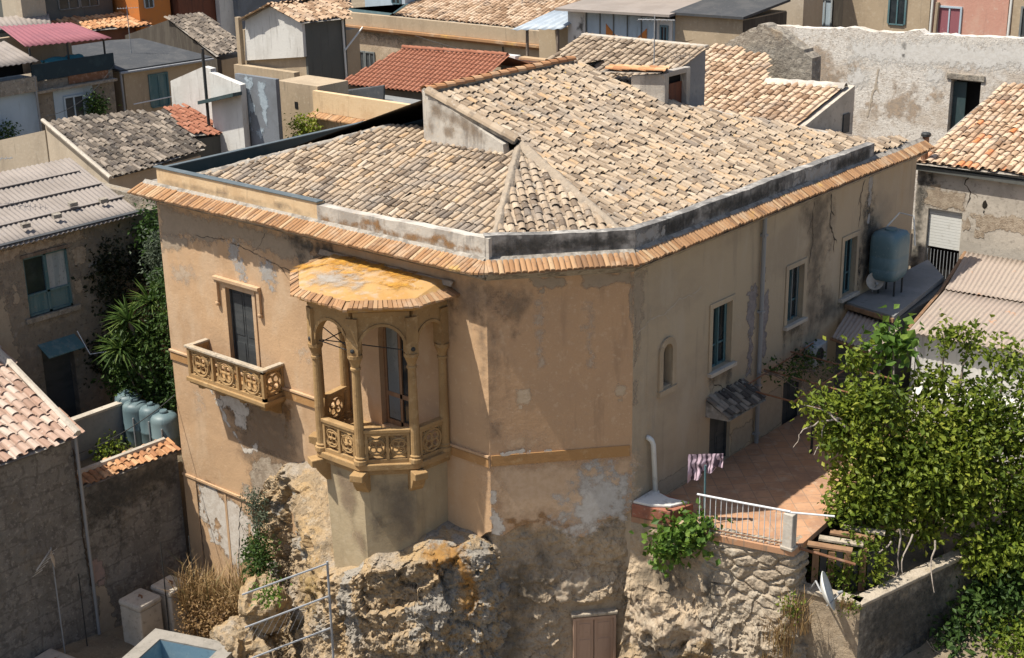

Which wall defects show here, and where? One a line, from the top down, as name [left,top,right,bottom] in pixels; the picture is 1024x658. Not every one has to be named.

crack [197,234,290,278]
crack [808,194,837,263]
water stain [859,177,875,281]
flaking render [923,184,1024,238]
peeling [199,390,282,576]
flaking render [490,491,505,536]
flaking render [547,458,632,537]